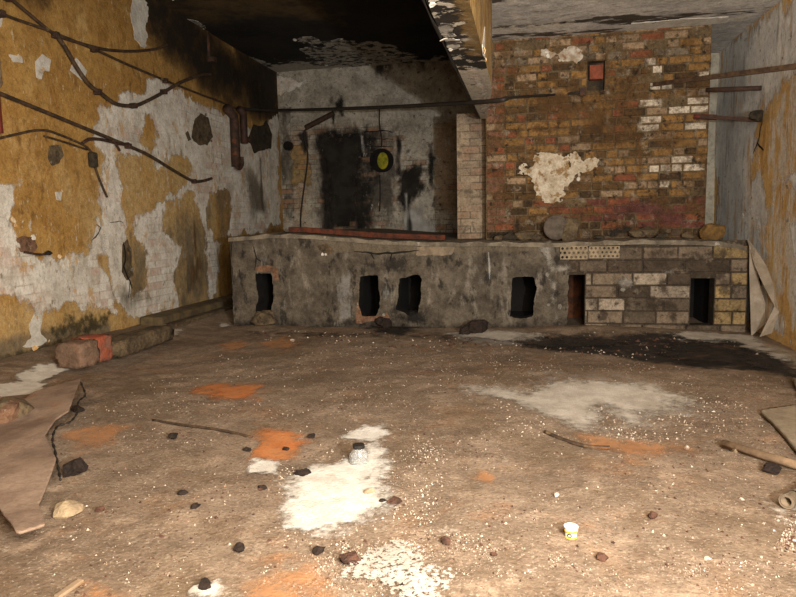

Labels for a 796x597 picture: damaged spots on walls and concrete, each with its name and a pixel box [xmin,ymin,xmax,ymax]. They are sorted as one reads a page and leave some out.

peeling [293,36,389,67]
peeling [438,23,462,51]
peeling [277,74,307,96]
peeling [715,0,796,266]
peeling [0,78,312,351]
water stain [321,158,334,229]
water stain [404,194,434,232]
flaking render [518,151,599,203]
peeling [747,265,784,334]